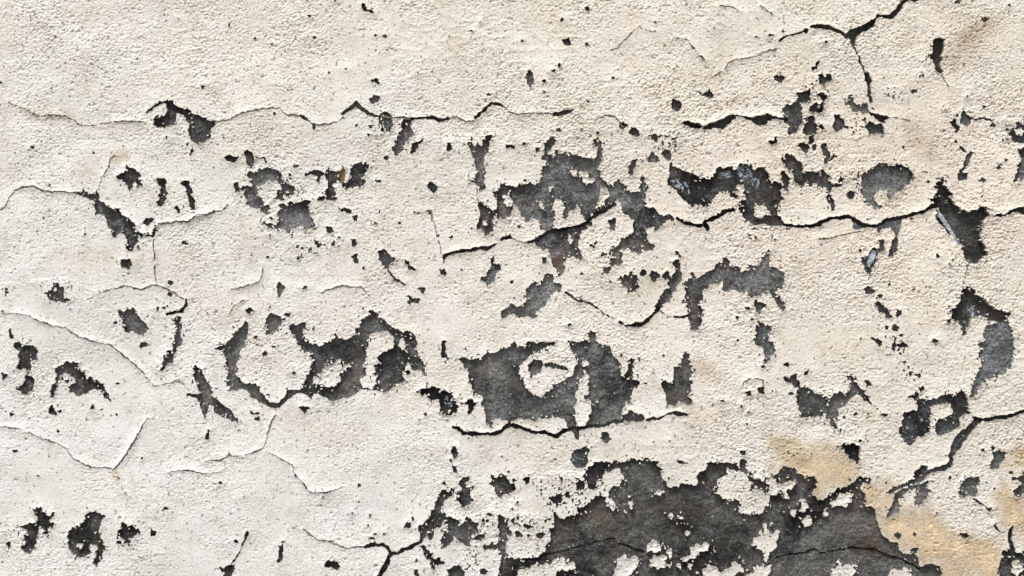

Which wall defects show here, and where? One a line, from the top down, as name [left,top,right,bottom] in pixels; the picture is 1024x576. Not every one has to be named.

crack [610,0,918,123]
peeling [145,94,217,154]
crack [681,113,788,130]
peeling [73,164,199,276]
crack [413,202,617,263]
crack [676,208,736,231]
crack [783,202,940,240]
peeling [1,328,115,417]
peeling [156,60,993,576]
peeling [858,236,1020,447]
crack [451,411,690,439]
peeling [4,501,167,567]